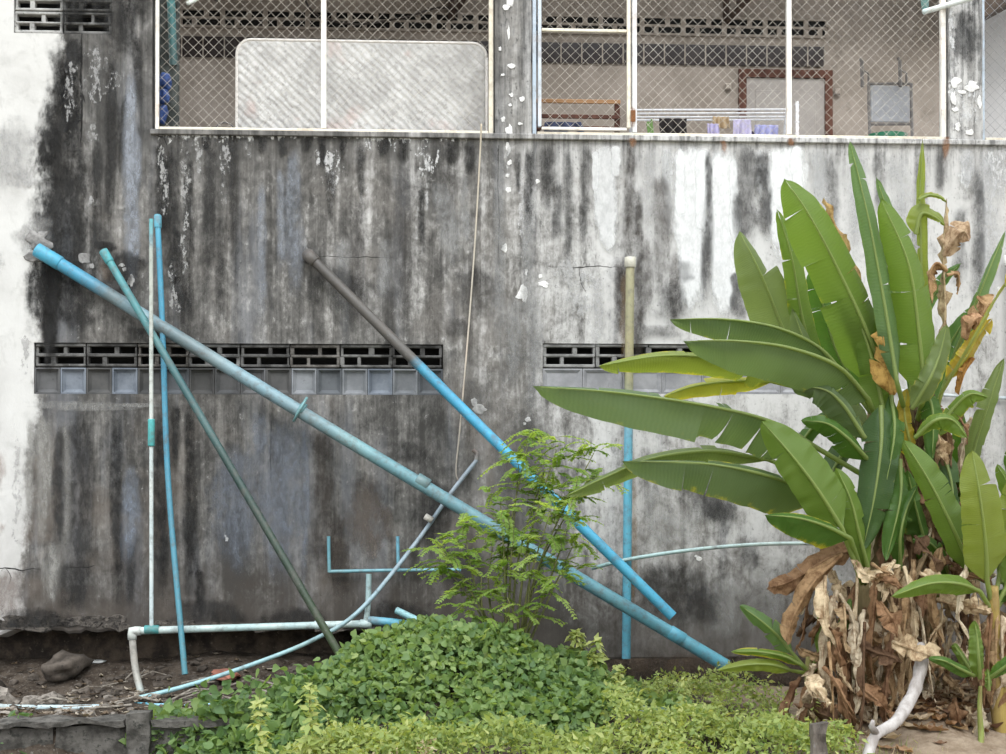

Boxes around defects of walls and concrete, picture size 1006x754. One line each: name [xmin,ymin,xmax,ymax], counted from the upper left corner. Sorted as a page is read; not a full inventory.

water stain [27,261,90,364]
water stain [0,0,143,290]
peeling [63,41,124,141]
water stain [155,145,194,318]
water stain [419,143,474,247]
water stain [516,146,837,355]
water stain [937,149,945,187]
peeling [947,77,982,135]
water stain [26,402,103,605]
water stain [110,421,136,598]
water stain [153,407,243,622]
water stain [262,609,314,623]